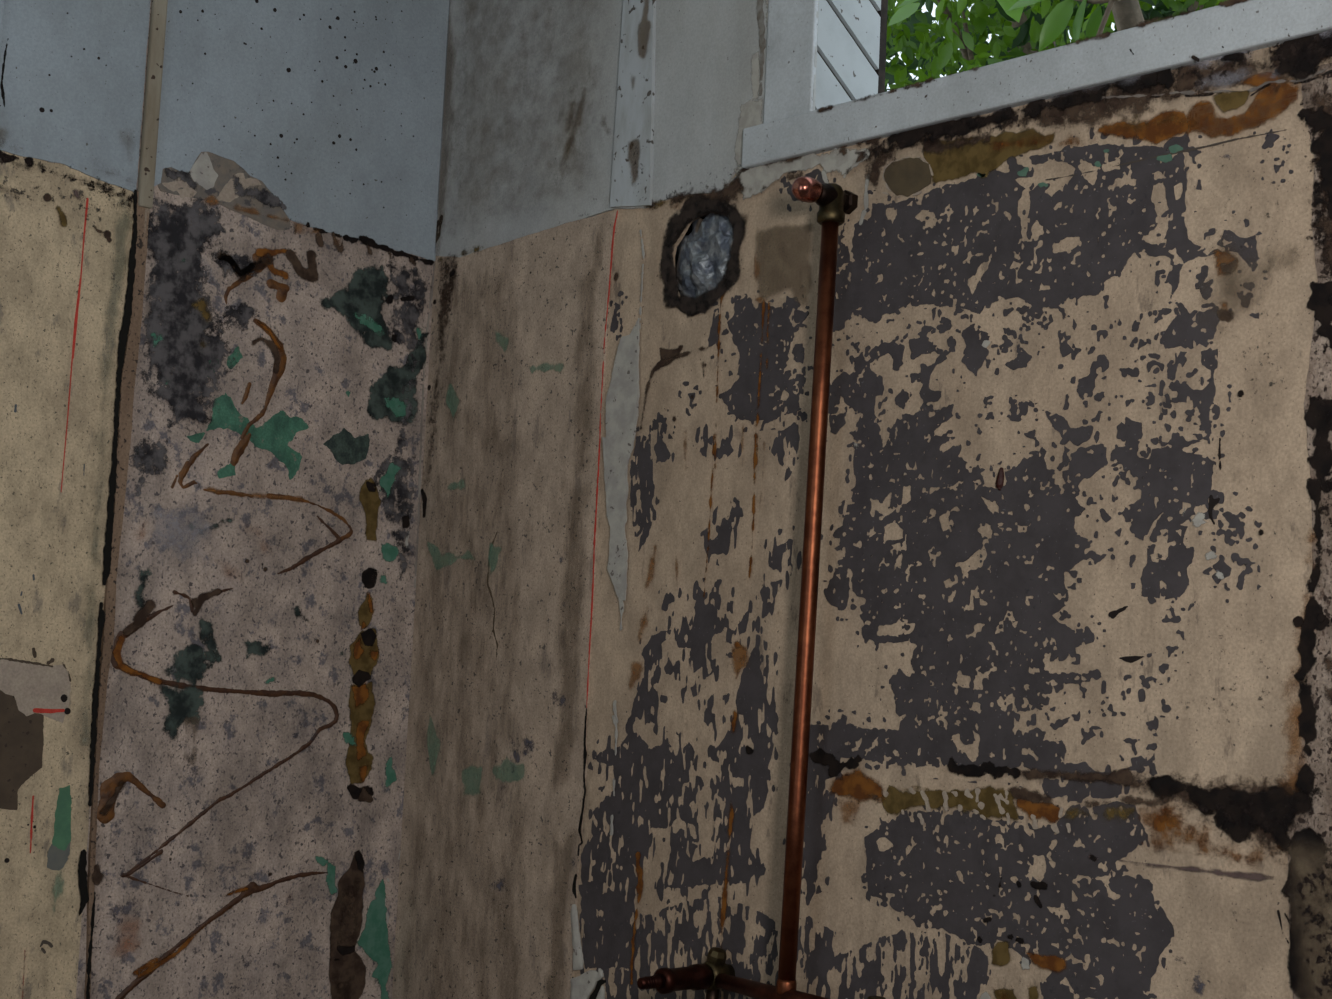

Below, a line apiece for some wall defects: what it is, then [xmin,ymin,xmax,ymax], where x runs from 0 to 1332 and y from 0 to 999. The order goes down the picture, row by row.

water stain [299,8,402,91]
water stain [0,150,134,343]
water stain [133,197,262,496]
peeling [1204,218,1259,319]
water stain [1307,281,1332,355]
peeling [630,412,675,552]
peeling [700,497,744,563]
peeling [909,265,1255,623]
peeling [660,529,802,742]
peeling [0,648,71,810]
peeling [801,714,846,906]
peeling [570,837,778,999]